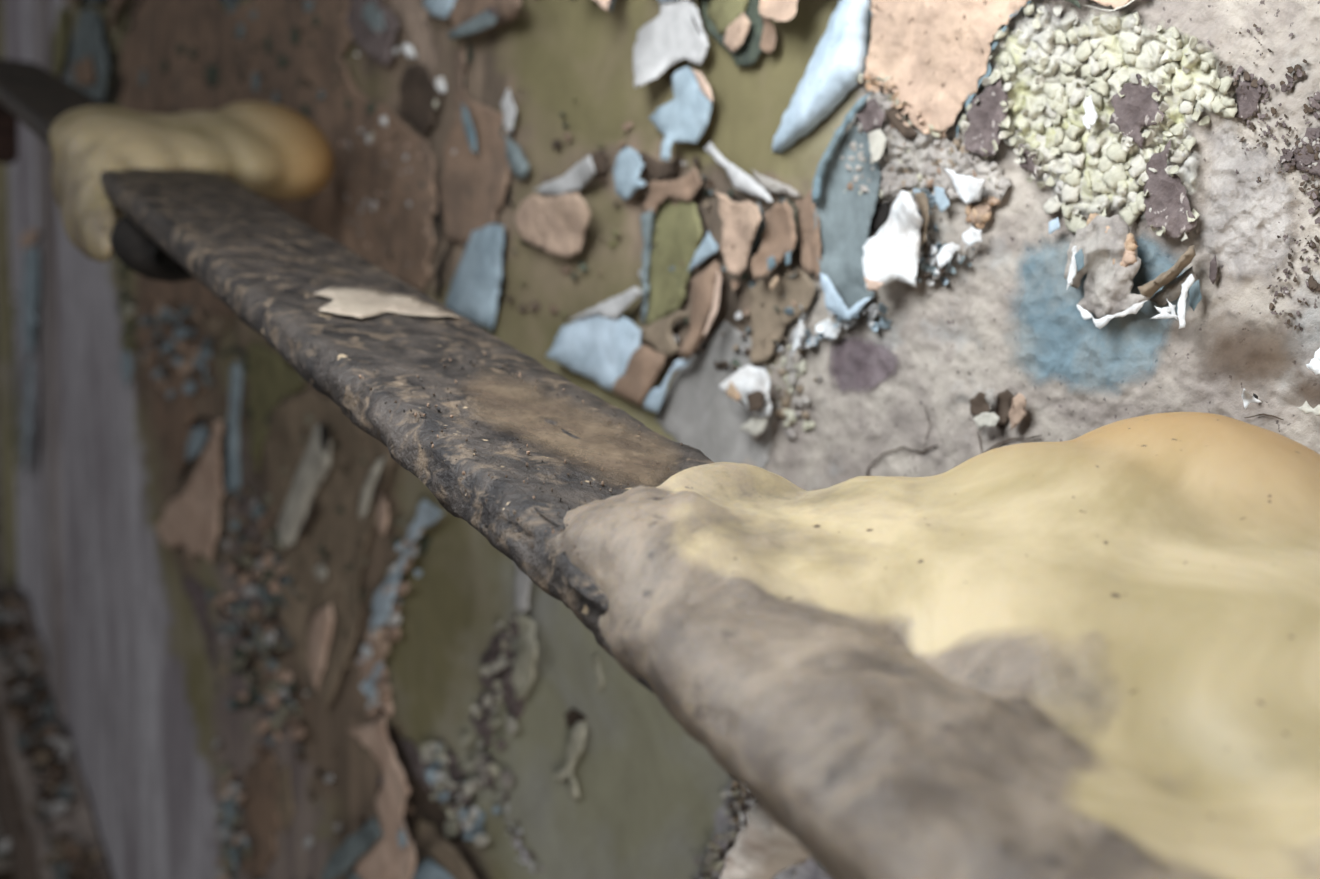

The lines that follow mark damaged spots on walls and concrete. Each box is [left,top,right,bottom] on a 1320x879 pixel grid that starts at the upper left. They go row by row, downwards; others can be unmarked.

peeling [1062,0,1134,11]
peeling [19,229,39,473]
peeling [155,417,229,563]
peeling [52,0,1044,469]
peeling [1049,217,1060,234]
peeling [1064,73,1218,329]
peeling [1241,389,1262,410]
peeling [1219,24,1320,331]
peeling [264,390,538,879]